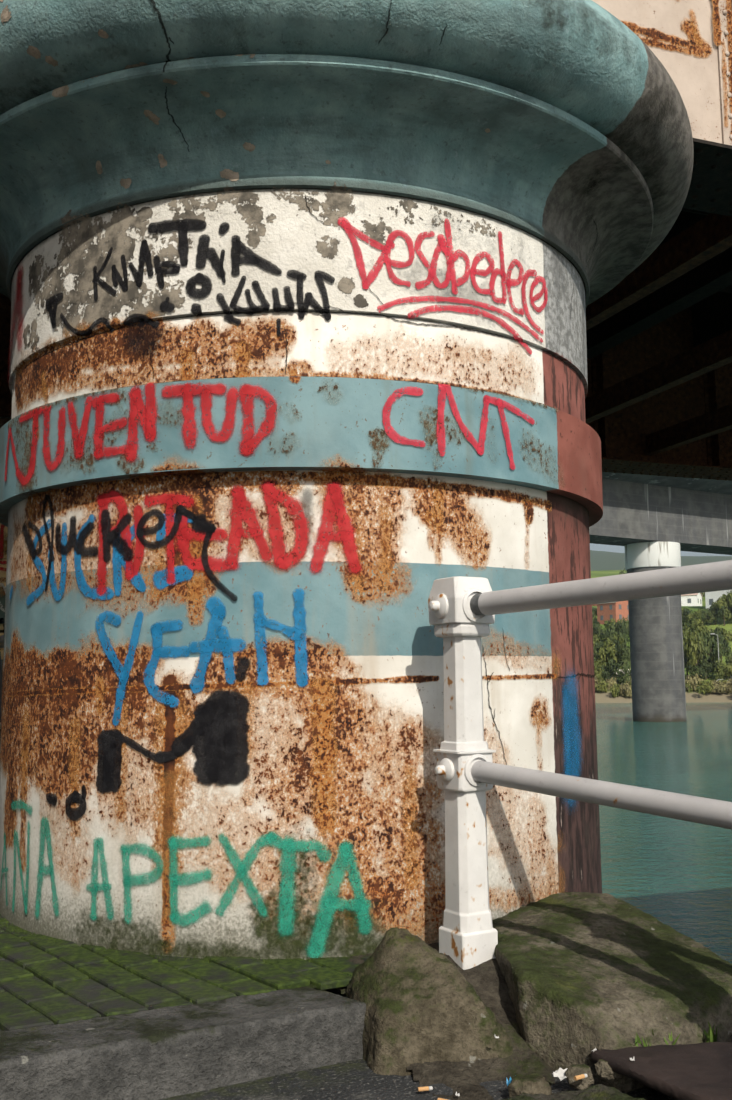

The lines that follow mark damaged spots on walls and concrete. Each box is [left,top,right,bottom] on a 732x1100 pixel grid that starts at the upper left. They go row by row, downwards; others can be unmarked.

crack [150,0,189,151]
rust [621,0,732,140]
peeling [23,169,276,354]
peeling [337,277,369,308]
peeling [270,181,496,259]
rust [0,313,563,625]
crack [482,628,510,765]
rust [531,693,551,744]
rust [0,632,445,952]
rust [486,785,563,909]